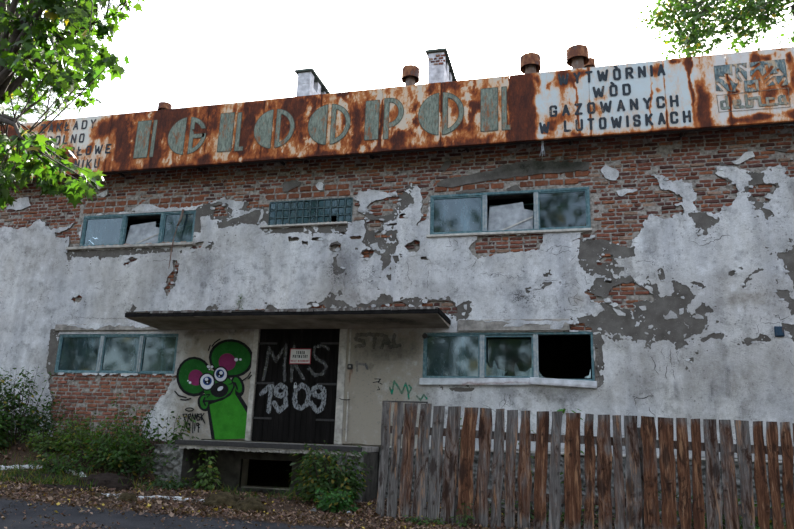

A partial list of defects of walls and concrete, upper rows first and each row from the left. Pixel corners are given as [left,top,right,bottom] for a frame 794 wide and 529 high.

flaking render [0,125,794,388]